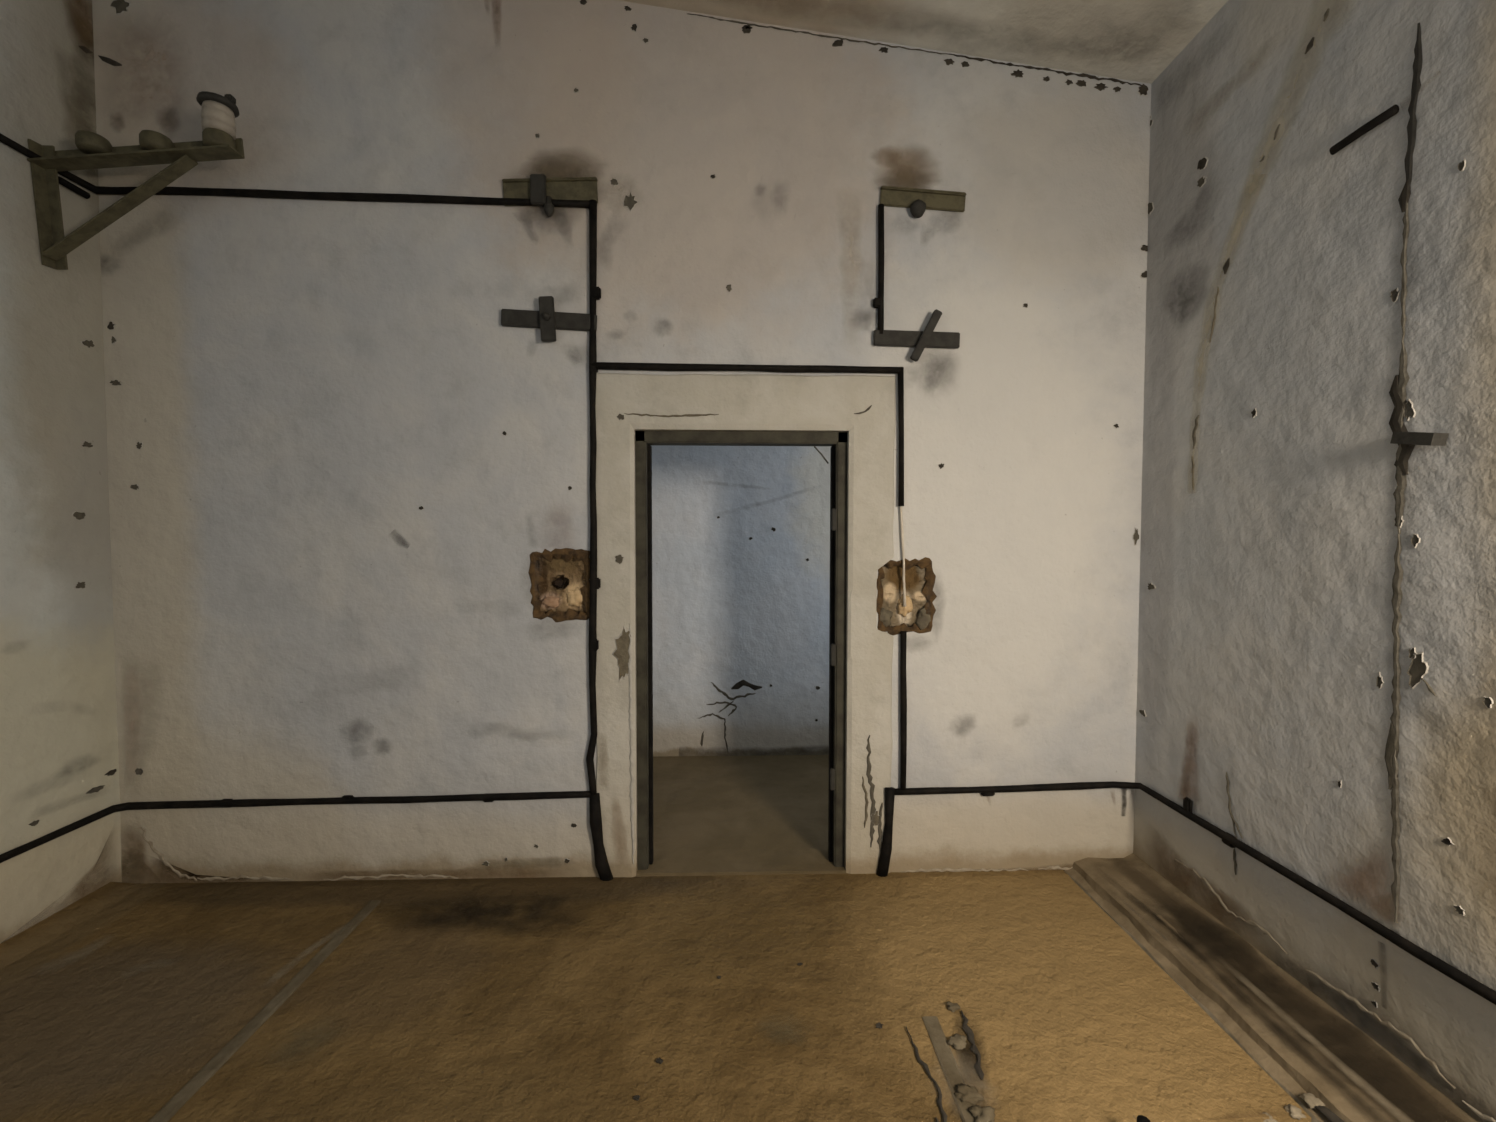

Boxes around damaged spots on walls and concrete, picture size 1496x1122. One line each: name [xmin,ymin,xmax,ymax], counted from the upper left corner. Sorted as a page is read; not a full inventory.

crack [1377,23,1423,923]
water stain [1126,891,1450,1122]